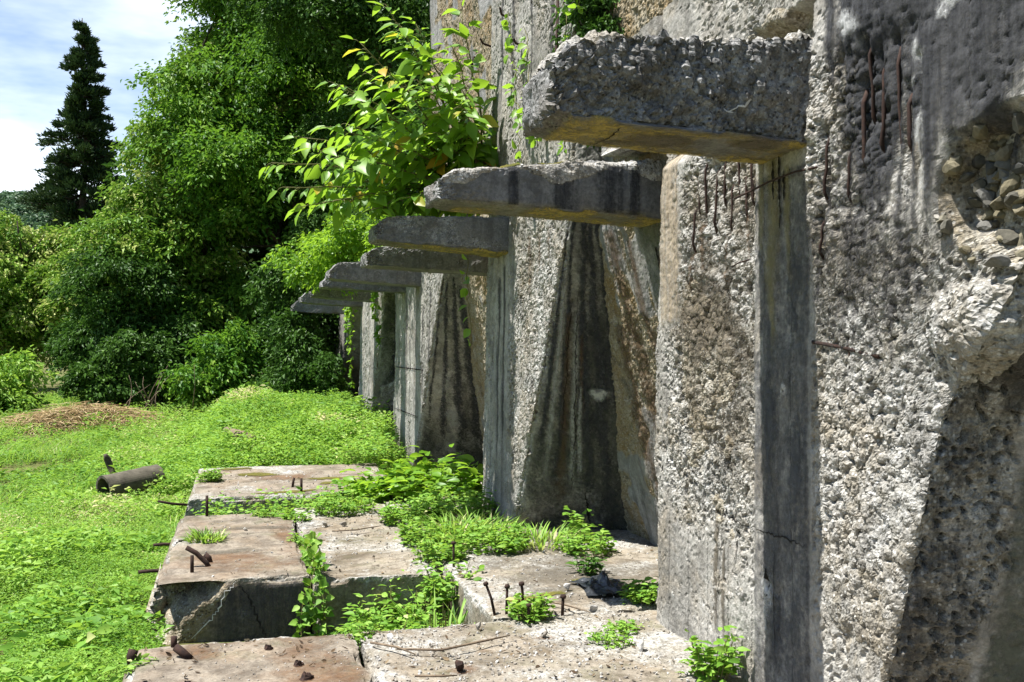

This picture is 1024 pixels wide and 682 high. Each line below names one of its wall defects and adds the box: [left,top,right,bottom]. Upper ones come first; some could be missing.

damp [501,0,516,94]
spalling [934,111,1024,267]
damp [382,242,508,477]
damp [509,0,1024,682]
crack [192,583,266,638]
crack [710,507,805,646]